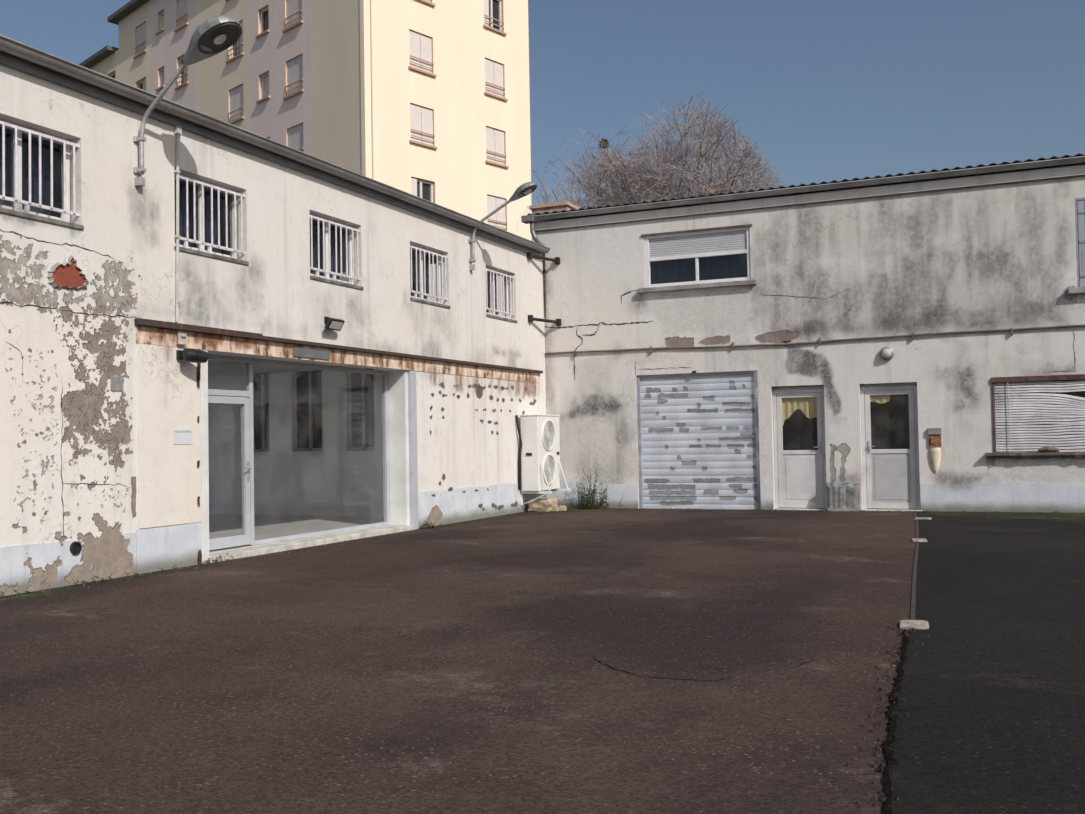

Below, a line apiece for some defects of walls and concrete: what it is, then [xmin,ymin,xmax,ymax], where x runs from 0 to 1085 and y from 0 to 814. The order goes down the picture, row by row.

damp [875,262,947,331]
corrosion [194,333,252,350]
crack [545,290,652,379]
flaking render [665,335,730,347]
flaking render [756,329,800,343]
peeling [0,235,142,596]
peeling [430,383,537,435]
damp [570,398,620,417]
damp [789,349,841,419]
crack [61,381,125,536]
peeling [830,443,850,483]
peeling [427,473,490,527]